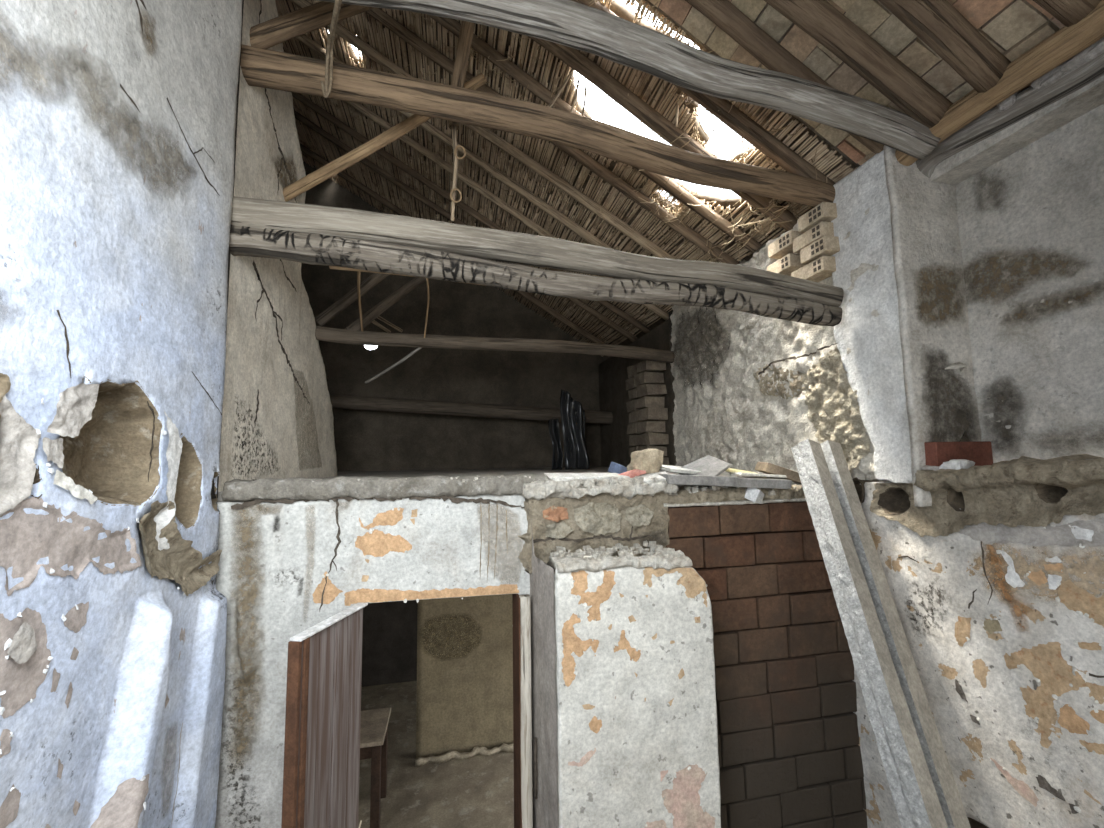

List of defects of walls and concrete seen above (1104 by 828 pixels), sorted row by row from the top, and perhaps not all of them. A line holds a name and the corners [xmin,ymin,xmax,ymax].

crack [135,0,146,32]
water stain [0,27,194,189]
crack [167,97,220,196]
crack [252,259,310,405]
water stain [924,354,977,442]
water stain [917,251,1104,323]
spalling [0,373,222,596]
crack [231,479,525,611]
peeling [312,508,519,606]
flaking render [870,481,1104,628]
peeling [0,608,73,758]
water stain [206,505,280,828]